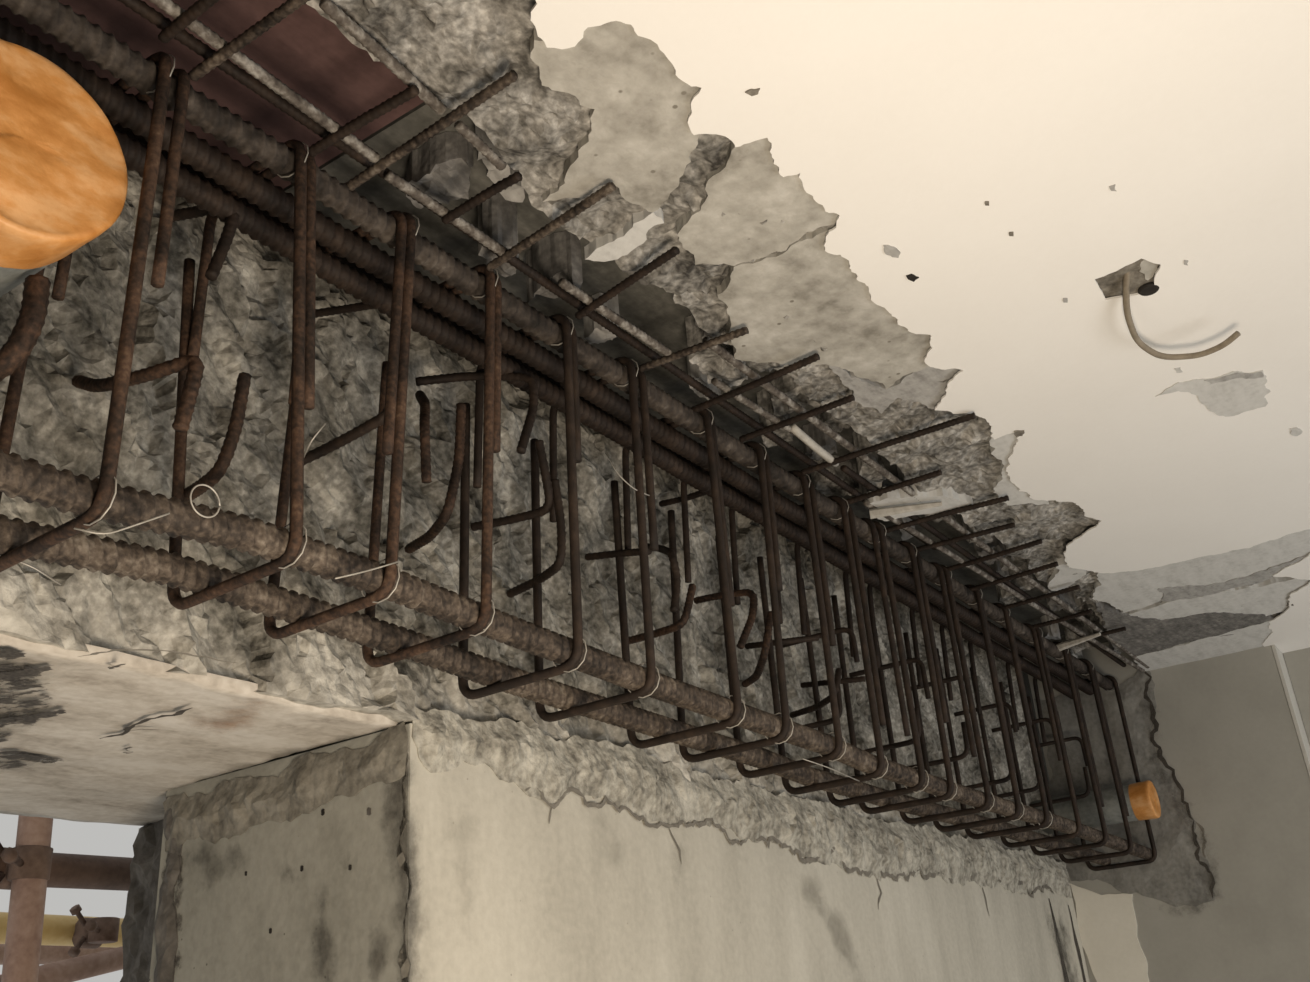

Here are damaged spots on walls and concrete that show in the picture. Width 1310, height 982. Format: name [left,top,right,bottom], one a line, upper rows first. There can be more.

spalling [217,50,420,168]
spalling [0,0,158,556]
spalling [131,117,206,372]
spalling [304,211,395,453]
spalling [790,416,860,464]
peeling [1156,367,1271,417]
spalling [648,551,673,630]
spalling [719,455,772,643]
spalling [770,460,821,639]
spalling [848,515,912,745]
spalling [865,663,948,808]
spalling [937,708,1015,826]